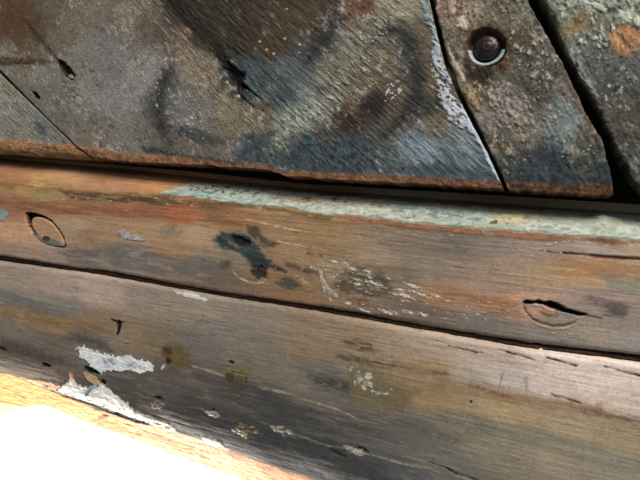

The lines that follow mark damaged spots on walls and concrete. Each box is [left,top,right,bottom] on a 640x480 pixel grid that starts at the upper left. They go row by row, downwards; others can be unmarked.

rust [612,26,640,52]
rust [464,24,511,87]
water stain [63,219,392,305]
peeling [323,261,428,317]
peeling [393,282,456,306]
crack [524,300,602,318]
peeling [28,345,176,432]
peeling [349,367,392,396]
peeling [202,436,229,449]